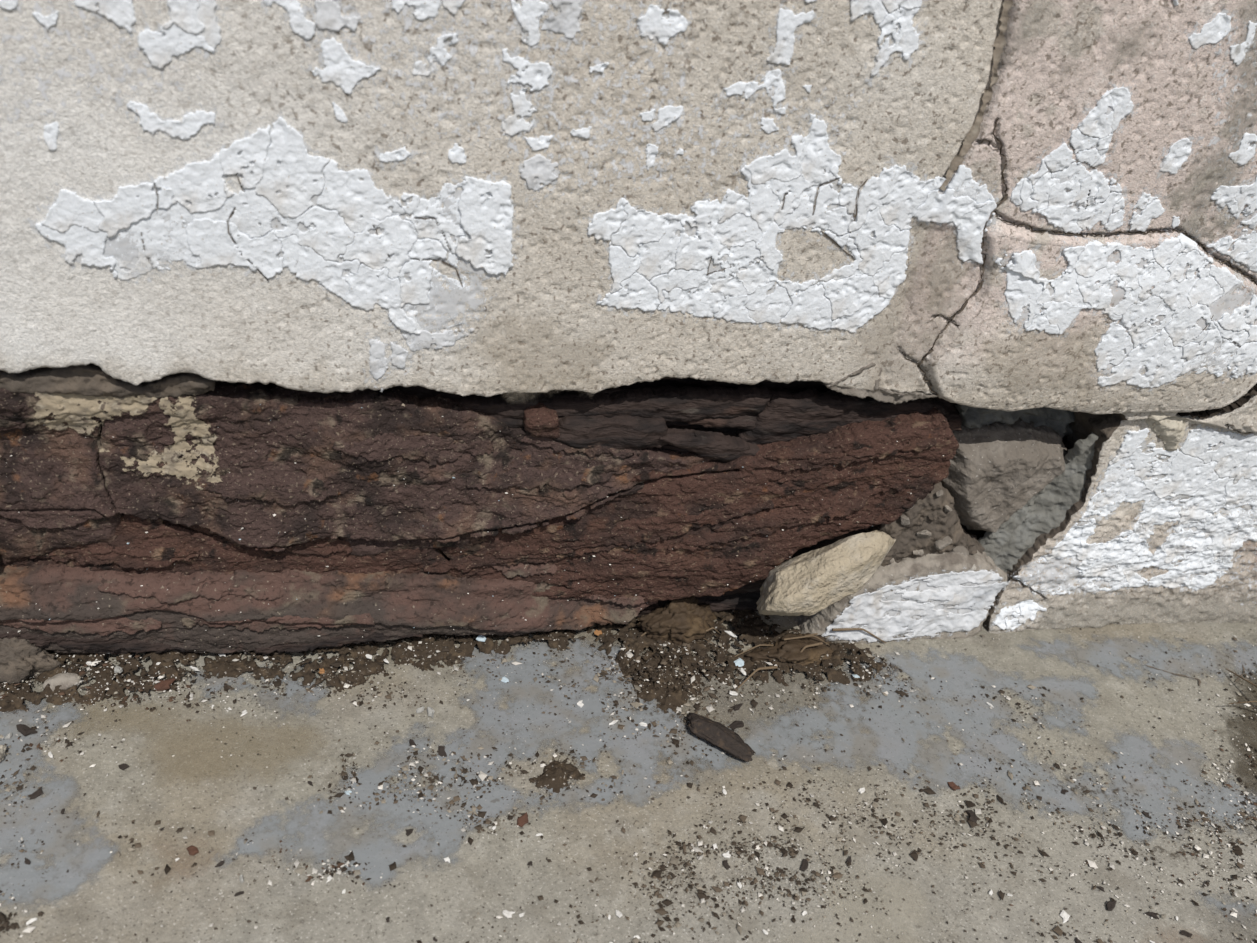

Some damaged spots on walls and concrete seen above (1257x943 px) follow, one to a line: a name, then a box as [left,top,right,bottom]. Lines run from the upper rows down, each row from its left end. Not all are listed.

peeling [28,0,1257,394]
crack [896,118,1257,398]
spalling [0,363,216,399]
rust [215,381,316,392]
rust [377,377,840,459]
crack [1178,383,1257,434]
rust [782,529,866,563]
peeling [955,404,1257,633]
rust [694,579,766,613]
peeling [227,639,740,887]
rust [687,713,755,762]
peeling [744,636,1257,841]